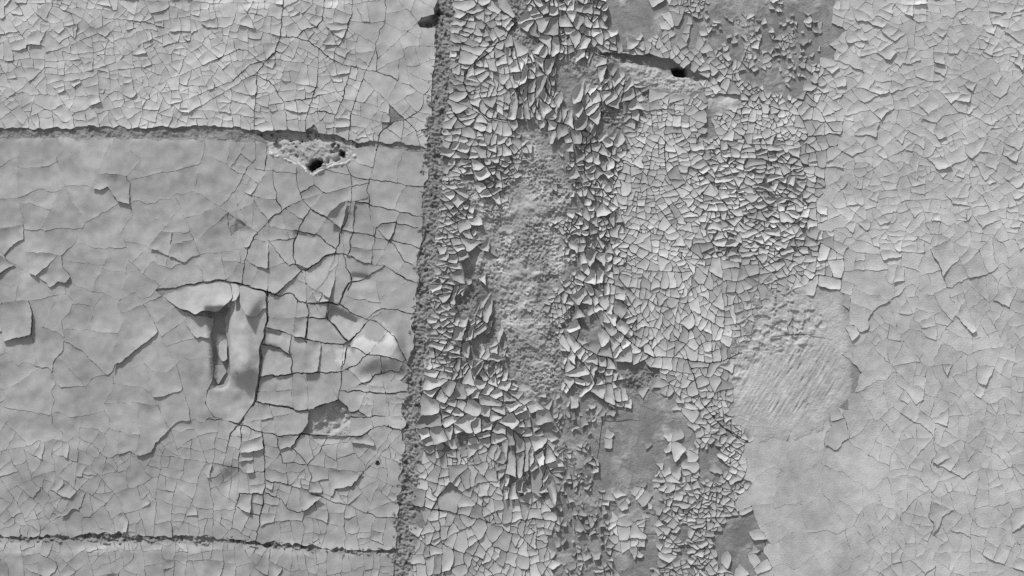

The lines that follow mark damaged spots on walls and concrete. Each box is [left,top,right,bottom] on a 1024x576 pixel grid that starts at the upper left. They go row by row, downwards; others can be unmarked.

peeling [0,0,443,576]
crack [186,147,414,550]
crack [216,0,430,151]
peeling [409,0,1024,576]